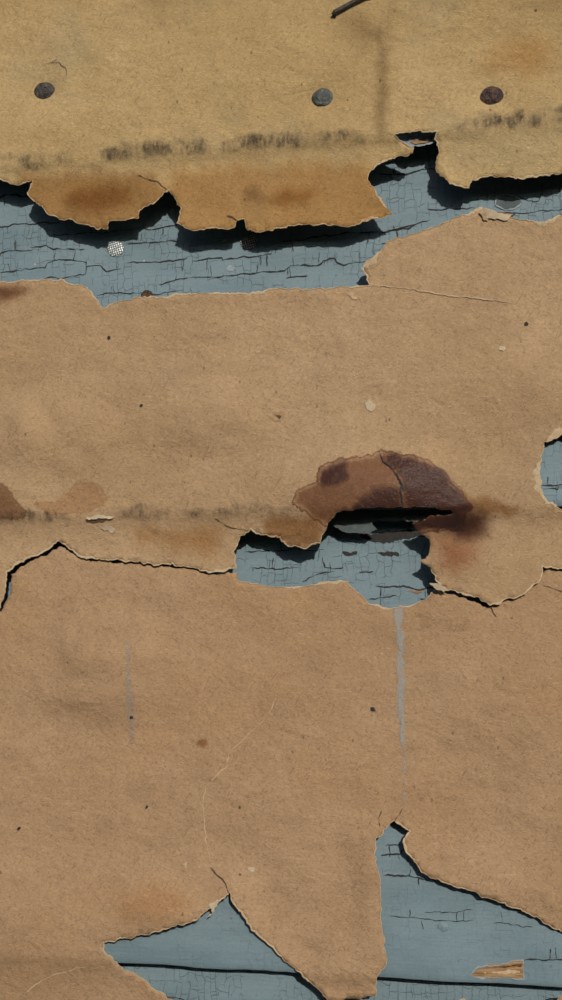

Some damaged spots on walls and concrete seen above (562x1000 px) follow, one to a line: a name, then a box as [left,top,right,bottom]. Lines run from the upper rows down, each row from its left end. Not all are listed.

peeling [399,134,435,147]
crack [380,167,436,180]
peeling [479,194,522,221]
crack [505,183,562,214]
crack [0,193,474,296]
peeling [333,512,442,557]
peeling [409,582,447,594]
leakage [394,608,405,743]
peeling [469,959,525,981]